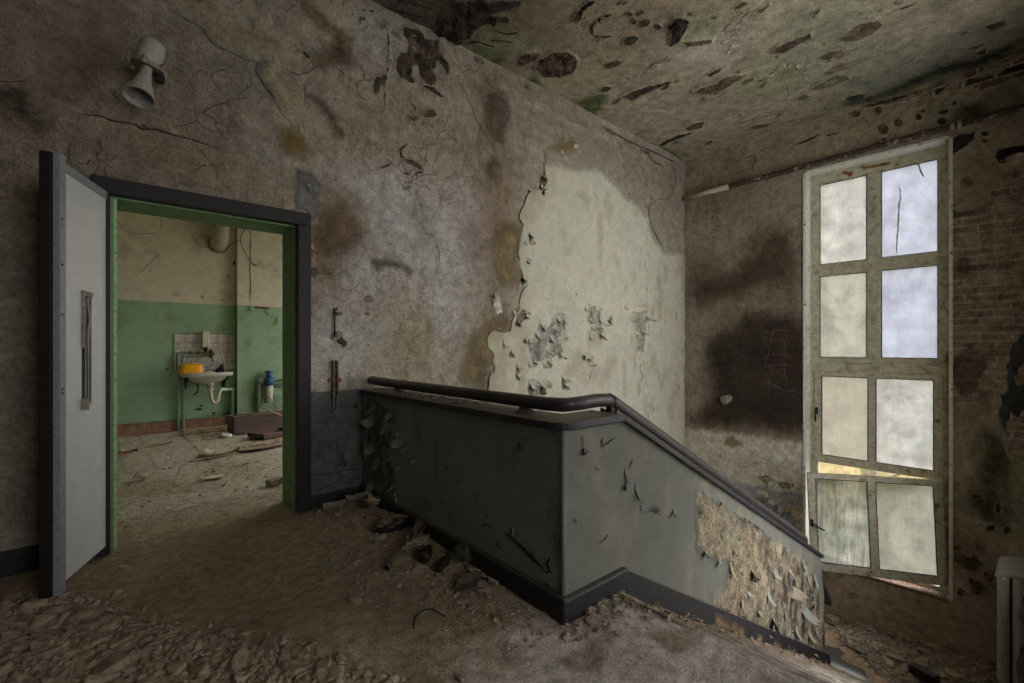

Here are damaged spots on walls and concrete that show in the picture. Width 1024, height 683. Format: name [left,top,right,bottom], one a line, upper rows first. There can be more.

crack [290,19,390,111]
flaking render [350,0,526,123]
damp [852,45,1014,104]
crack [81,113,217,148]
flaking render [596,0,1024,465]
peeling [493,292,571,396]
peeling [585,303,614,341]
damp [692,317,803,431]
peeling [752,461,803,533]
peeling [693,485,826,658]